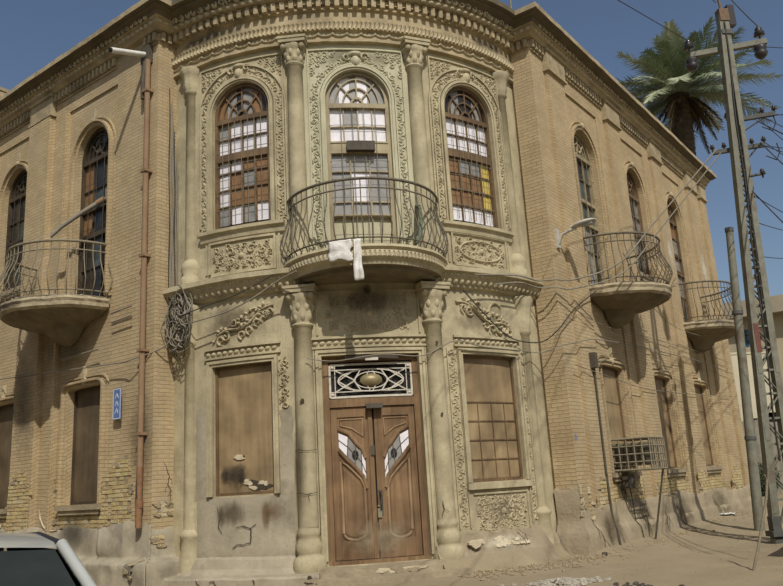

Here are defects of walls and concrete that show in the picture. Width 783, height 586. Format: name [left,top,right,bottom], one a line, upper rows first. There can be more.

spalling [0,470,32,533]
spalling [52,455,134,529]
water stain [219,504,239,521]
crack [217,507,256,549]
flaking render [467,535,530,549]